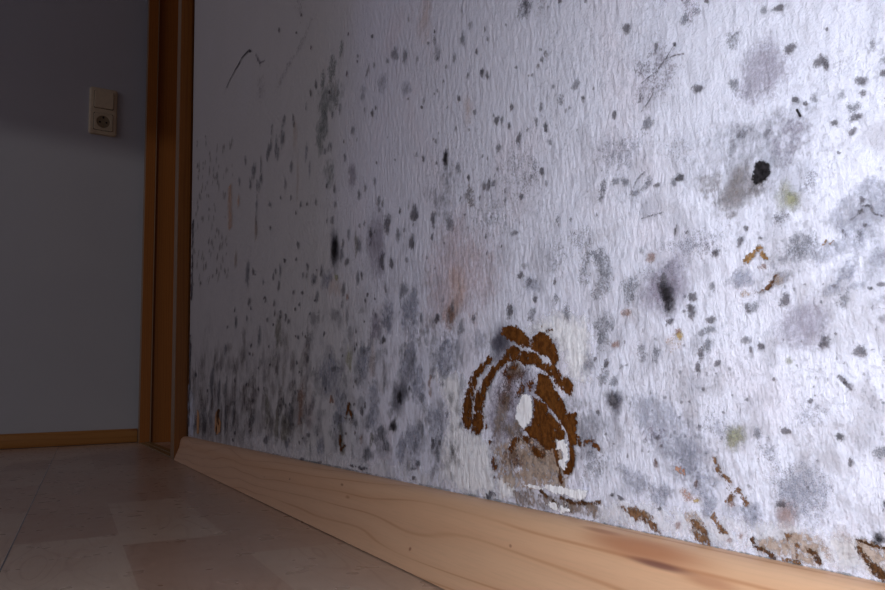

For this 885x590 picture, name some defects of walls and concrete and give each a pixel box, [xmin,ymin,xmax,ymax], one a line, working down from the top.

water stain [813,53,828,70]
water stain [848,77,866,135]
water stain [722,161,771,206]
water stain [331,237,349,264]
water stain [594,249,612,300]
water stain [649,264,681,324]
water stain [395,382,410,408]
water stain [248,418,396,480]
water stain [414,293,881,582]